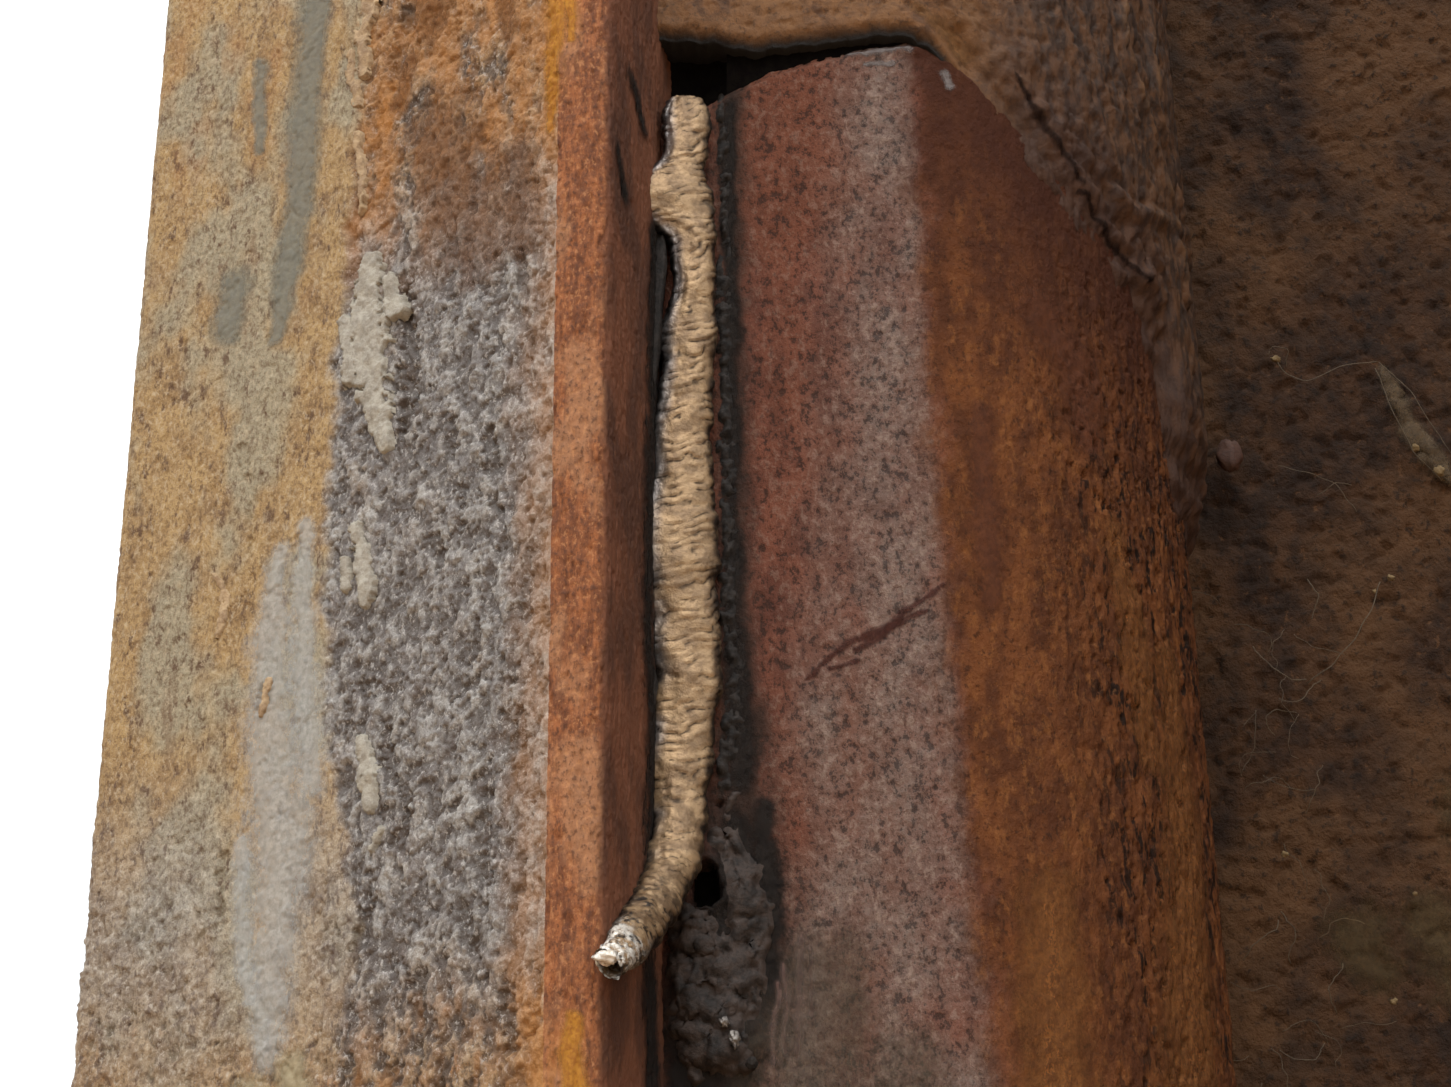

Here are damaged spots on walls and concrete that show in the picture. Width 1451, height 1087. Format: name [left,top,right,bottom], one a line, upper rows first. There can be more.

corrosion [544,0,575,132]
crack [1015,72,1153,282]
peeling [382,271,413,322]
peeling [336,314,356,390]
peeling [339,556,355,594]
corrosion [560,1011,586,1087]